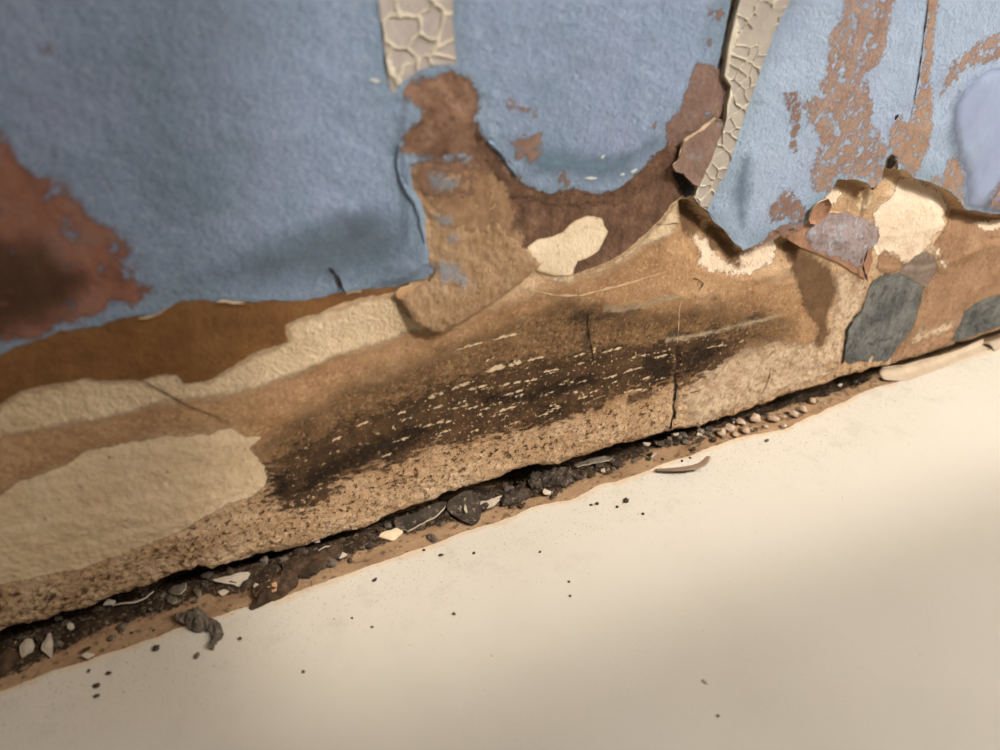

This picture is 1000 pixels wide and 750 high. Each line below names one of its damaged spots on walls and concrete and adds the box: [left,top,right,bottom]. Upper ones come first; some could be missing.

flaking render [0,428,268,584]
crack [143,380,230,422]
peeling [0,132,426,434]
peeling [213,572,250,588]
crack [378,0,456,94]
leakage [0,218,837,617]
peeling [399,62,806,283]
crack [669,278,707,429]
crack [691,0,790,218]
flaking render [783,0,1000,381]